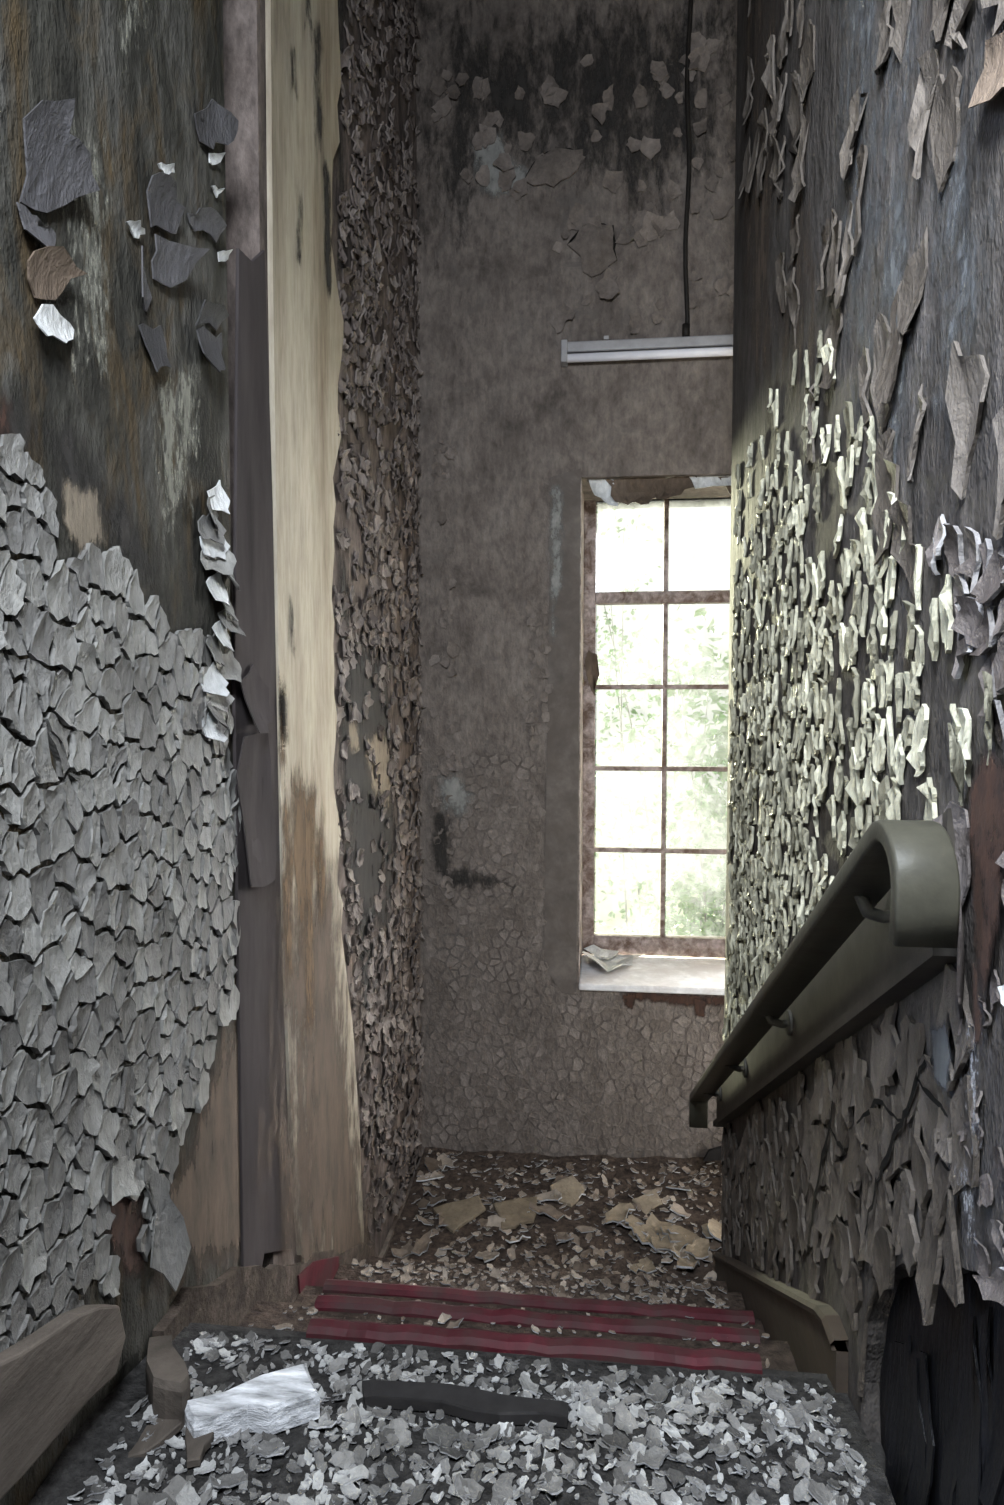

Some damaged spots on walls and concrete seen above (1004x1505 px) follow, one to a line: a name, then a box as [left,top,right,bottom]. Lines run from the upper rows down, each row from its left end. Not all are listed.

peeling [16,98,100,343]
peeling [126,163,233,372]
peeling [194,99,239,165]
peeling [552,0,1004,464]
peeling [333,0,734,1274]
peeling [858,225,1004,1051]
peeling [0,433,277,1352]
crack [422,743,980,1332]
spalling [857,1091,1004,1505]
water stain [961,1031,983,1243]